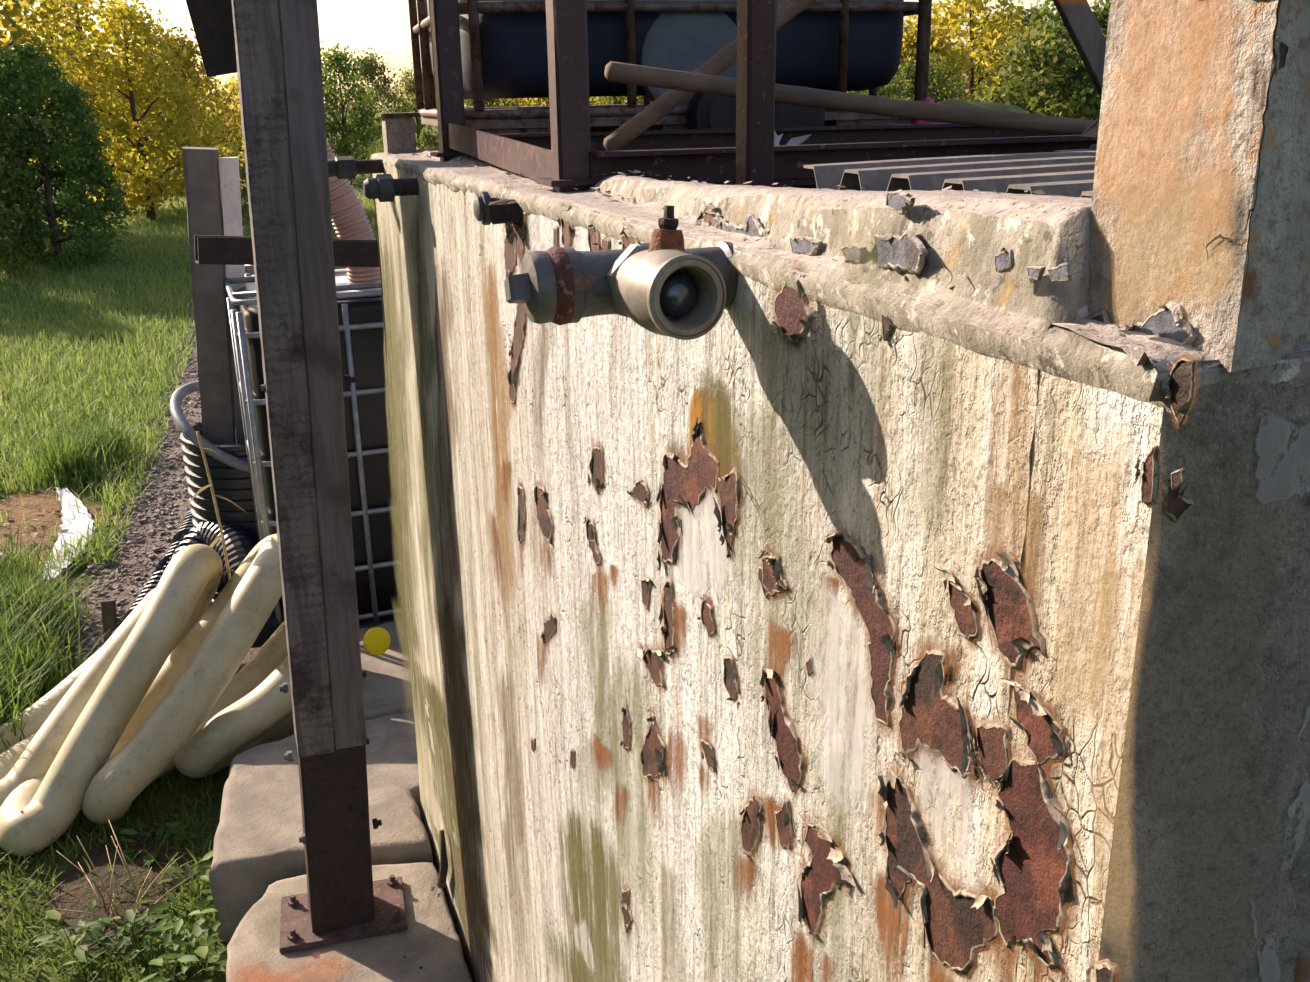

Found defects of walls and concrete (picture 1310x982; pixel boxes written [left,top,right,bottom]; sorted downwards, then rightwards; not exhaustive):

peeling [1272,35,1289,74]
peeling [574,170,671,205]
peeling [662,203,772,242]
peeling [772,189,928,348]
peeling [626,418,742,688]
peeling [723,655,740,701]
peeling [739,667,856,937]
peeling [806,657,815,676]
peeling [817,528,1076,976]
damp [570,813,604,982]